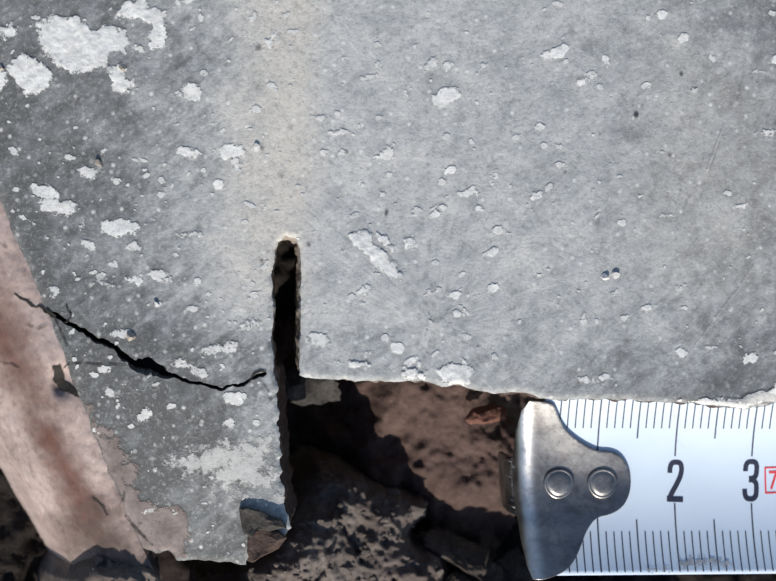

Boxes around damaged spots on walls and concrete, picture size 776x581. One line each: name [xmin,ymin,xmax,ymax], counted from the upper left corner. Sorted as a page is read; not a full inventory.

water stain [0,0,194,97]
crack [14,293,268,391]